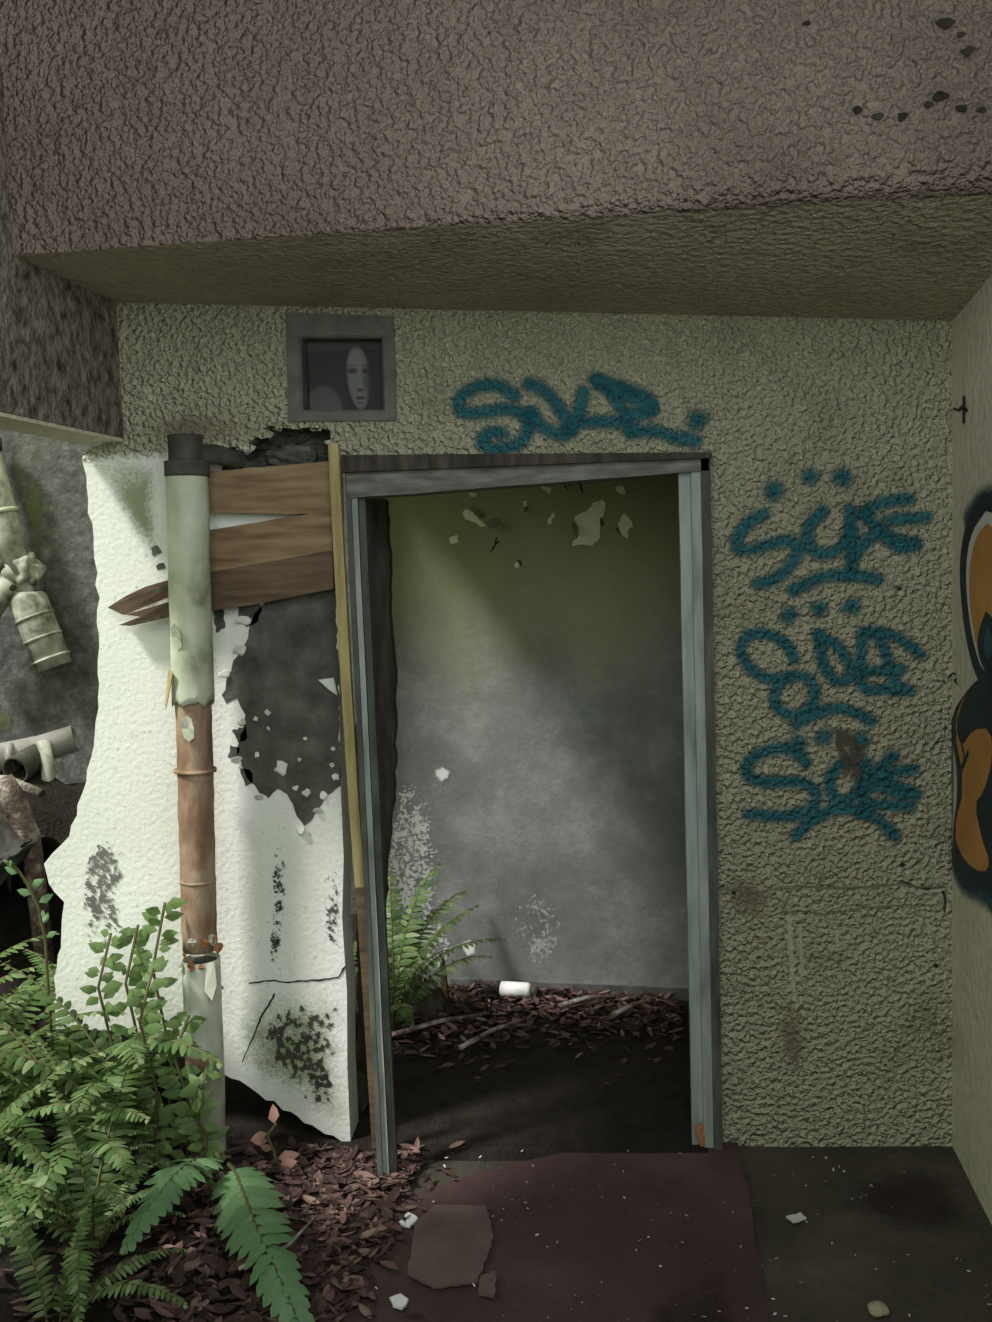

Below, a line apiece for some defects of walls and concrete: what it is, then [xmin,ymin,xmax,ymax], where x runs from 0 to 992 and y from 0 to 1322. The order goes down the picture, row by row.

spalling [222,424,337,470]
peeling [463,492,499,528]
peeling [572,500,633,546]
peeling [214,589,342,835]
corrosion [175,700,218,955]
water stain [388,785,453,969]
crack [719,870,947,915]
crack [221,965,347,1062]
water stain [258,1005,337,1104]